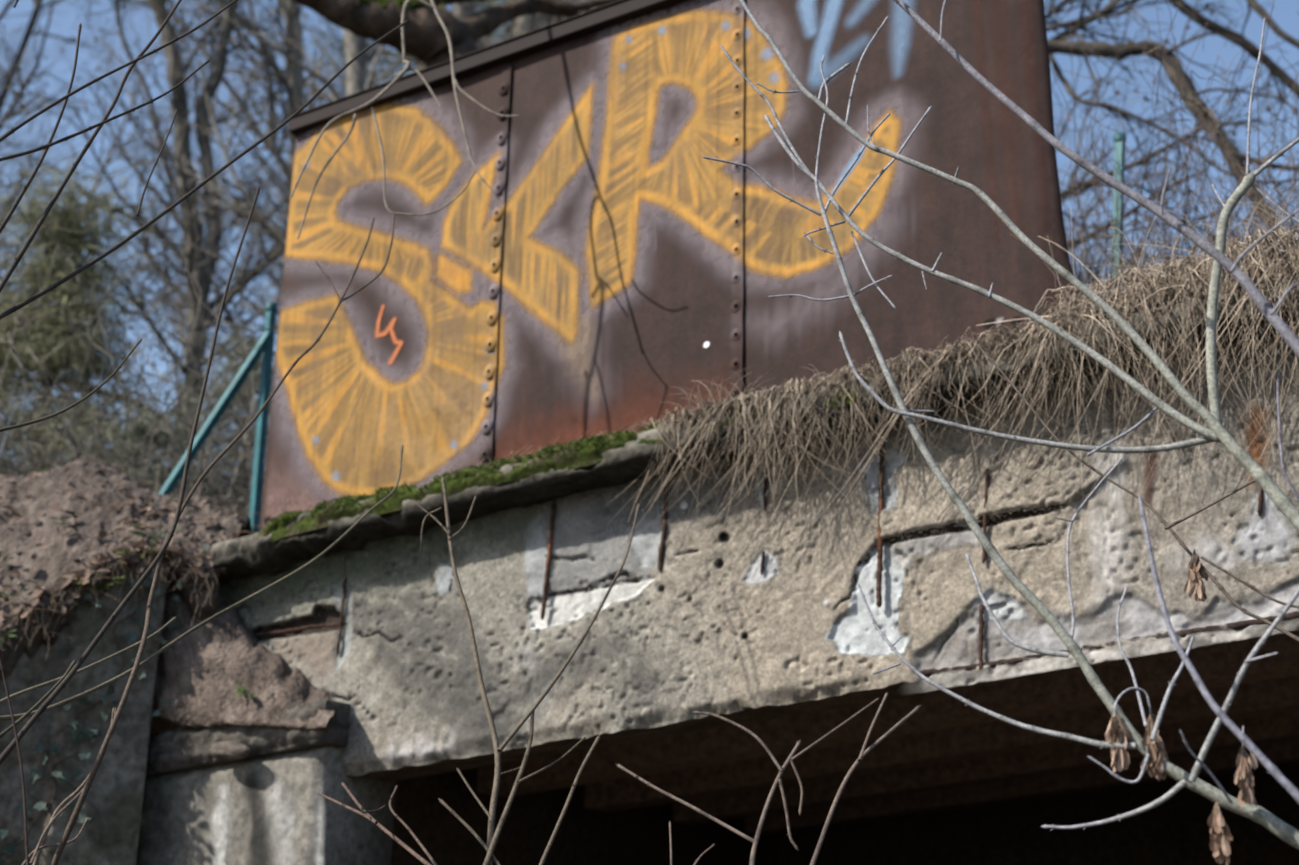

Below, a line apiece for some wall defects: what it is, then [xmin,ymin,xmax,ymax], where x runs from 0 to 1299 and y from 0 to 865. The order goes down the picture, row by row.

corrosion [498,403,711,460]
corrosion [264,472,329,527]
spalling [253,549,353,670]
crack [358,631,402,642]
spalling [525,483,670,630]
spalling [744,550,779,584]
spalling [826,434,979,655]
crack [883,468,1066,564]